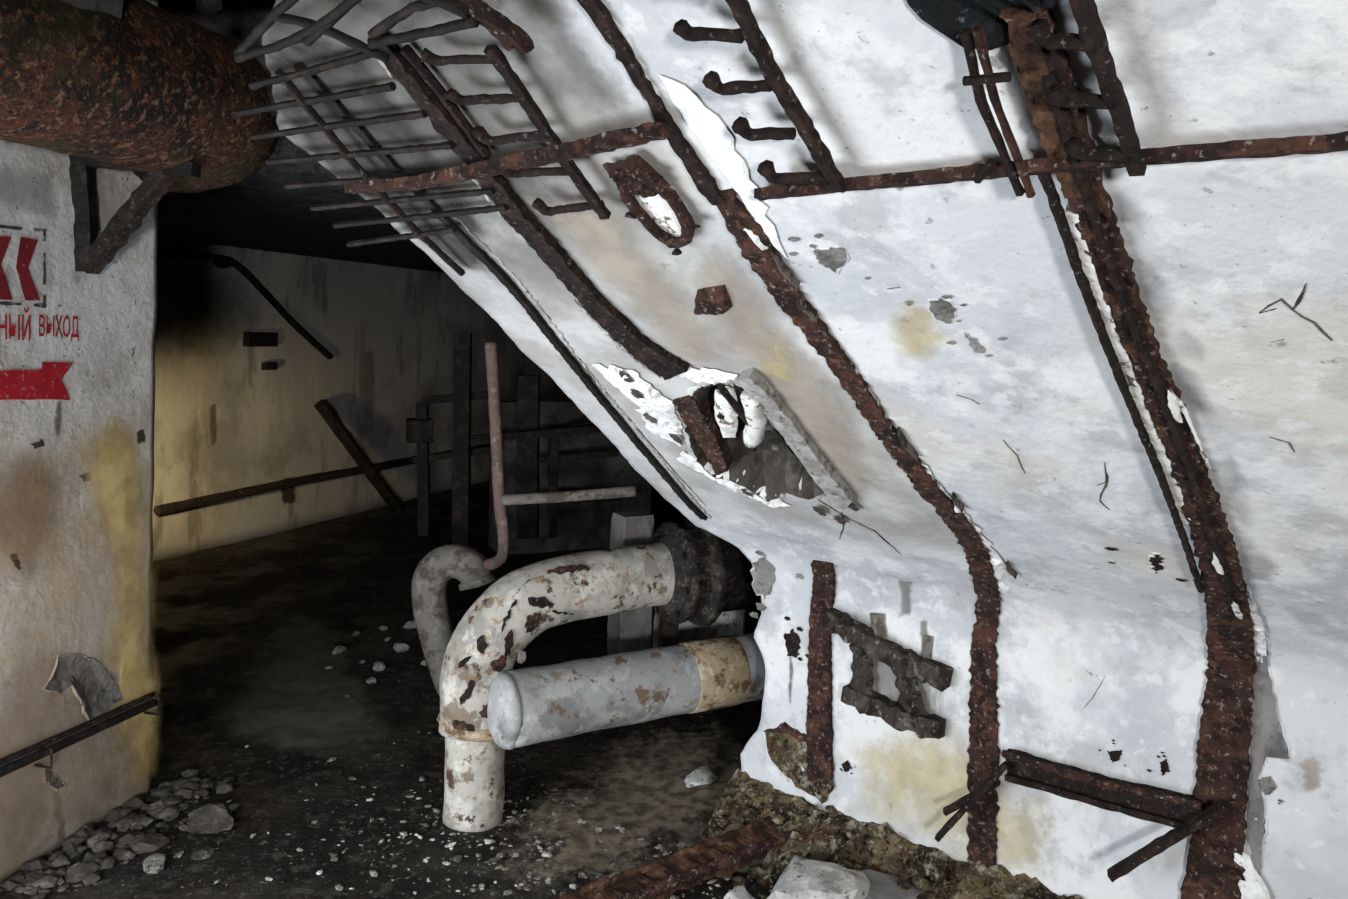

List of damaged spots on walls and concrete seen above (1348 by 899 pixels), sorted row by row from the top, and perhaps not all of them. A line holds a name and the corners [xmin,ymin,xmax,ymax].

spalling [906,0,1057,50]
spalling [234,0,860,525]
spalling [905,295,992,357]
crack [1259,284,1333,343]
corrosion [672,395,733,475]
peeling [1167,390,1212,471]
peeling [868,388,1017,594]
spalling [750,551,777,618]
spalling [783,616,808,661]
spalling [872,655,900,701]
spalling [763,722,856,804]
peeling [1231,587,1292,899]